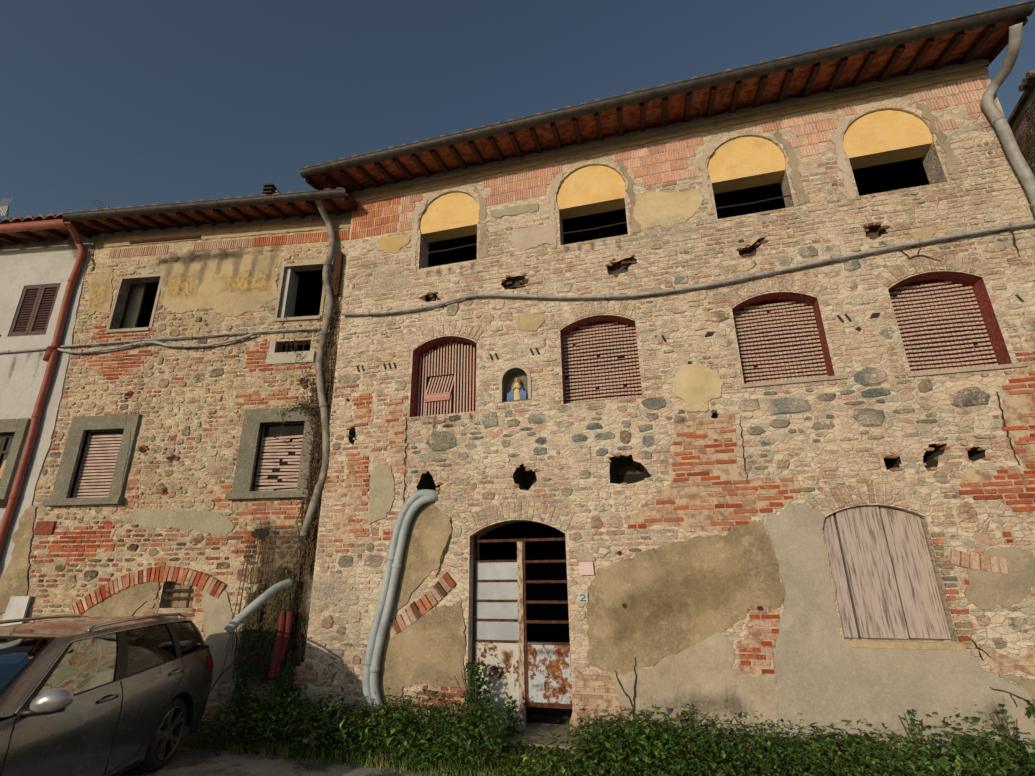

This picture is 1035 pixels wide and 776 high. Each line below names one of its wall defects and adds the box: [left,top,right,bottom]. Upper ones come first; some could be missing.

flaking render [159,254,278,317]
spalling [501,274,529,289]
spalling [605,255,637,276]
spalling [736,237,768,258]
flaking render [333,388,410,543]
spalling [416,471,443,495]
spalling [510,464,540,491]
flaking render [570,361,1035,774]
flaking render [379,508,468,717]
rust [503,643,572,709]